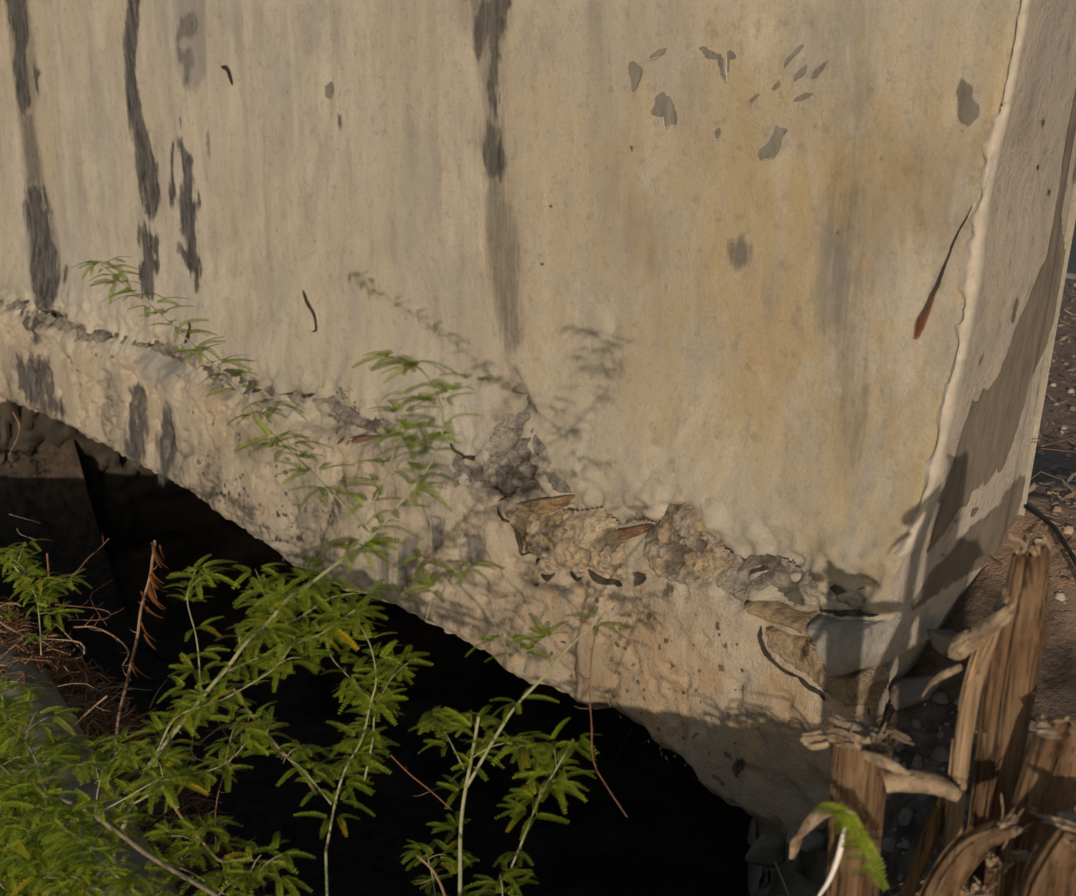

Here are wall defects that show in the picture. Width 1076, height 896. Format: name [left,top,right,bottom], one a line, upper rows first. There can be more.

leakage [6,0,67,416]
leakage [124,383,176,487]
leakage [122,0,202,301]
spalling [0,298,396,443]
leakage [474,0,516,343]
flaking render [651,92,677,129]
flaking render [700,46,736,83]
flaking render [758,126,787,160]
corrosion [914,292,936,339]
peeling [893,0,1076,557]
spalling [452,380,901,710]
crack [757,626,826,701]